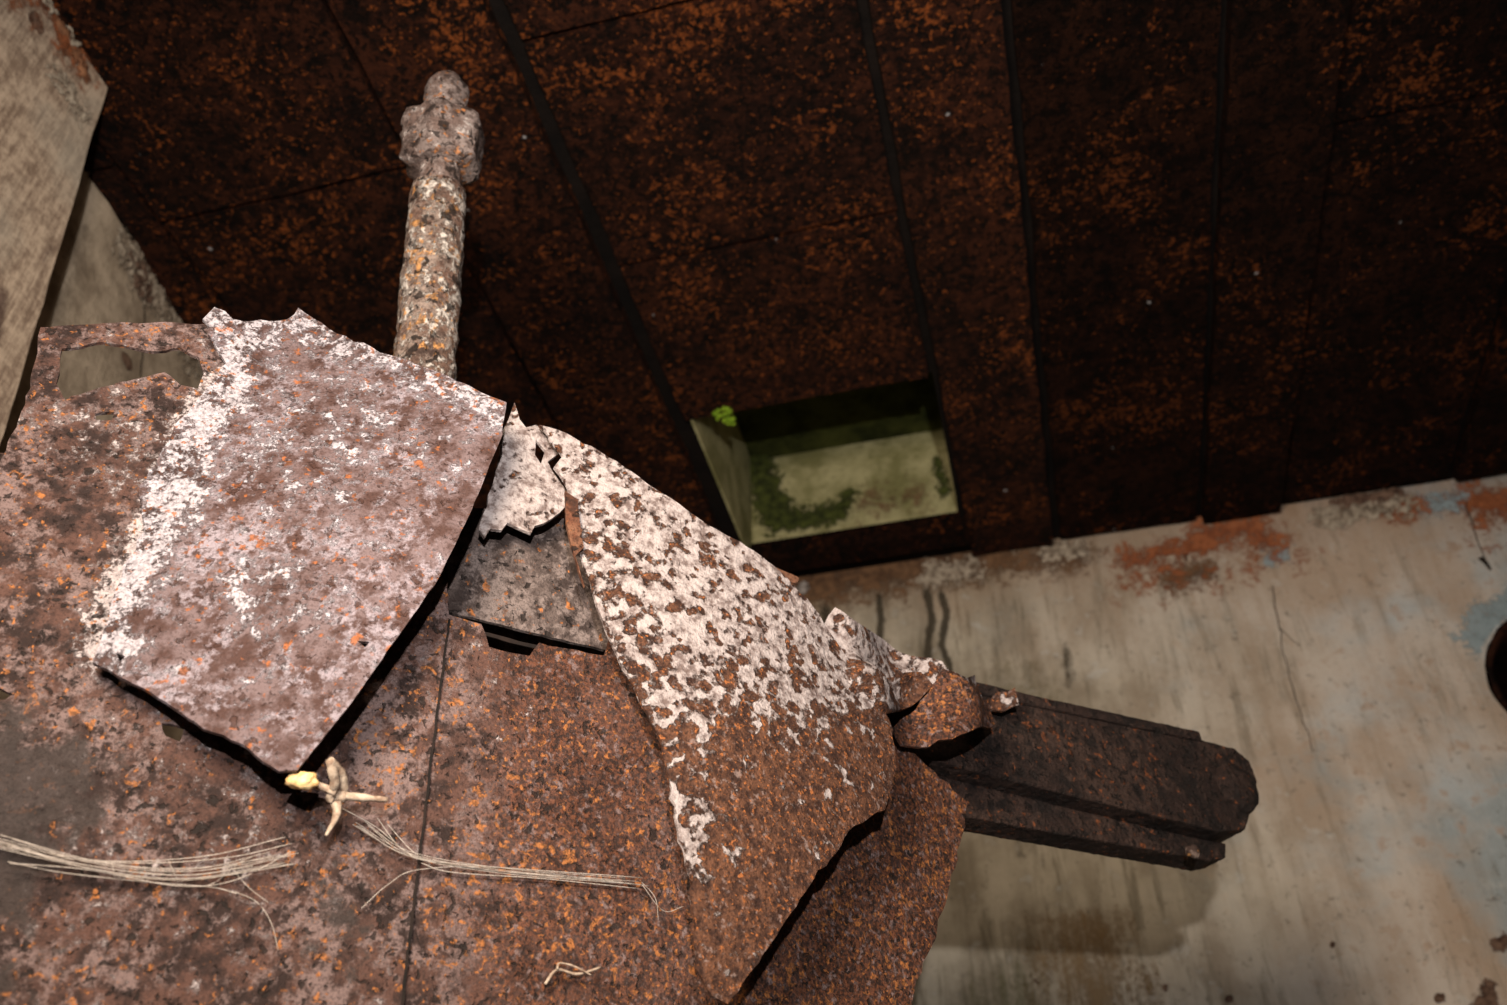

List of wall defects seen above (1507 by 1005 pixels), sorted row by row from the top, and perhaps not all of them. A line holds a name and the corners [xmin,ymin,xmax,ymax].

rust [1436,475,1507,553]
damp [794,539,1107,671]
rust [1113,516,1324,605]